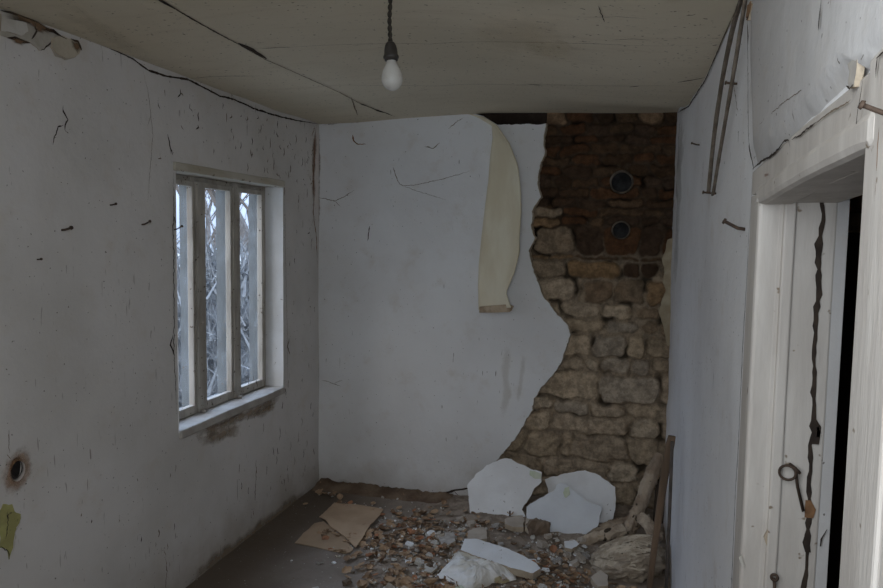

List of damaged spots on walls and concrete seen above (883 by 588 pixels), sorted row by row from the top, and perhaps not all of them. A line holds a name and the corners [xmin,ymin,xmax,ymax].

flaking render [0,10,82,60]
crack [158,0,392,116]
crack [633,6,749,111]
flaking render [469,112,677,506]
crack [731,52,883,588]
water stain [205,400,283,442]
peeling [0,504,22,559]